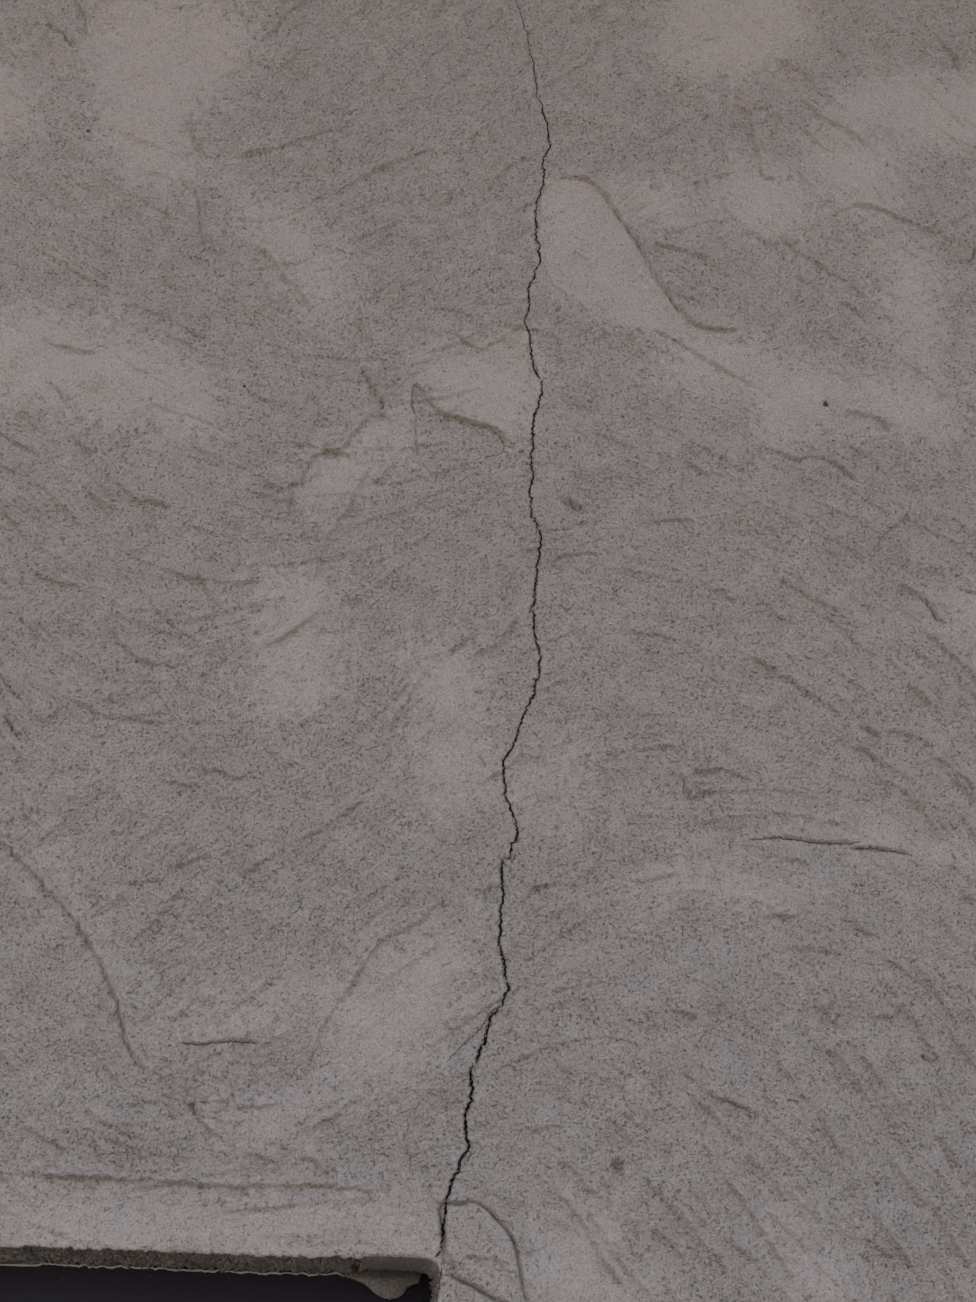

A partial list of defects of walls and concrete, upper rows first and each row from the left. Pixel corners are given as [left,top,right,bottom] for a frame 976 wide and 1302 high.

crack [435,0,551,1276]